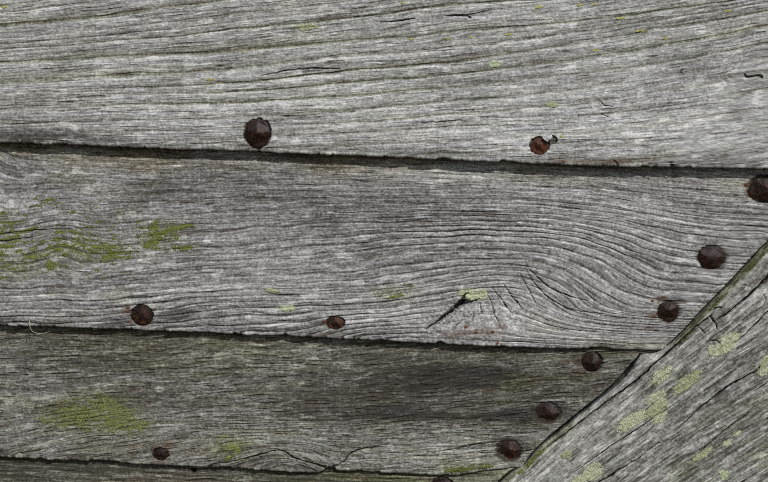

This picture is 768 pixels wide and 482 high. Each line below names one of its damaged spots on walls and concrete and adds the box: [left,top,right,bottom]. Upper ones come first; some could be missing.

crack [426,266,604,329]
crack [206,444,387,469]